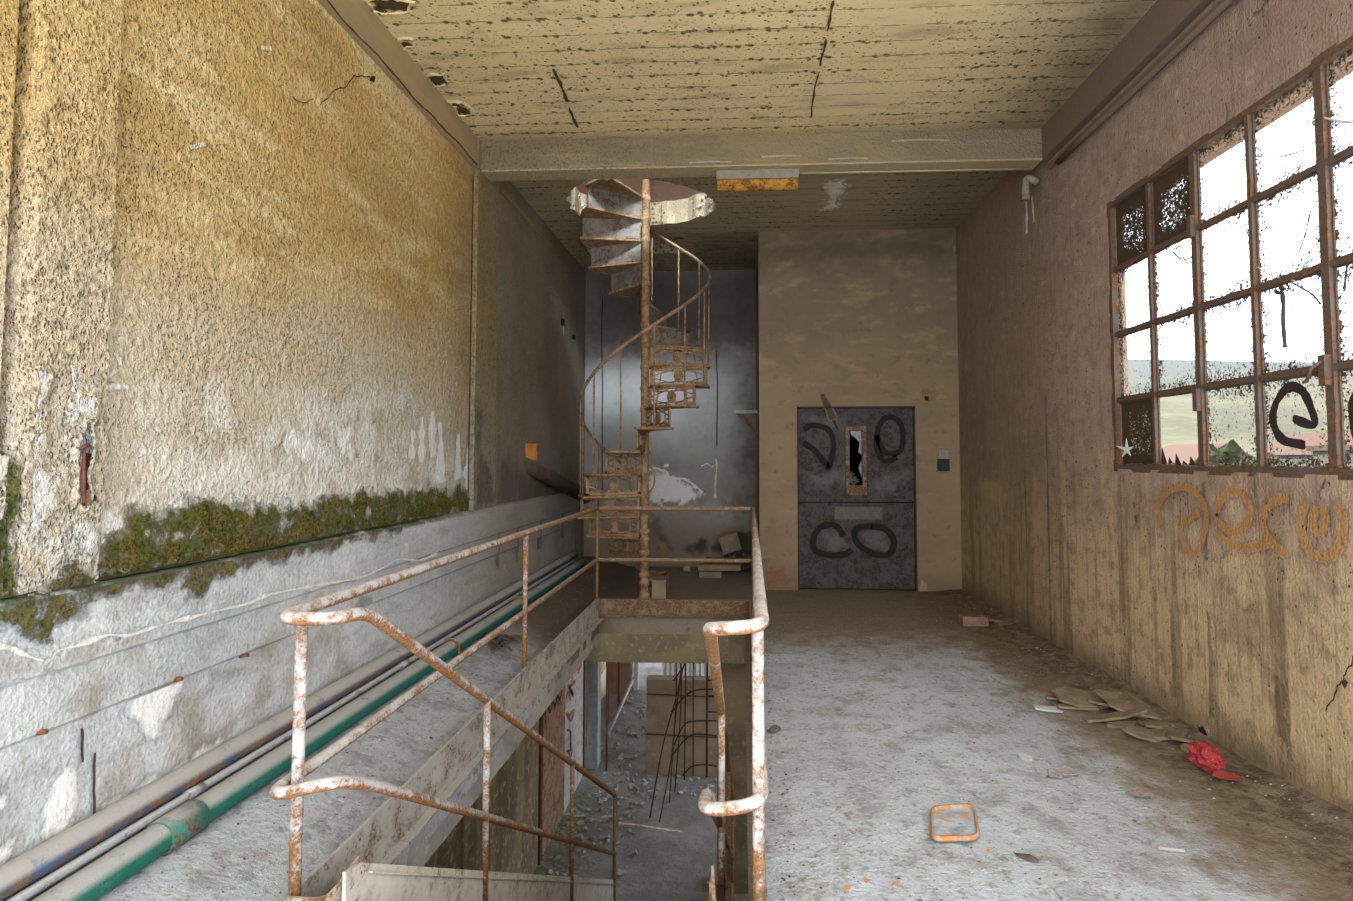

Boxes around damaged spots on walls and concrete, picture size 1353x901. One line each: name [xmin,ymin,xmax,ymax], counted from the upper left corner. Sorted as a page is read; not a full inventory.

spalling [364,0,420,16]
crack [552,68,579,128]
crack [810,0,835,119]
leakage [100,154,580,554]
spalling [26,364,102,515]
spalling [0,497,8,520]
leakage [0,552,438,686]
leakage [1127,480,1353,805]
crack [1325,655,1353,711]